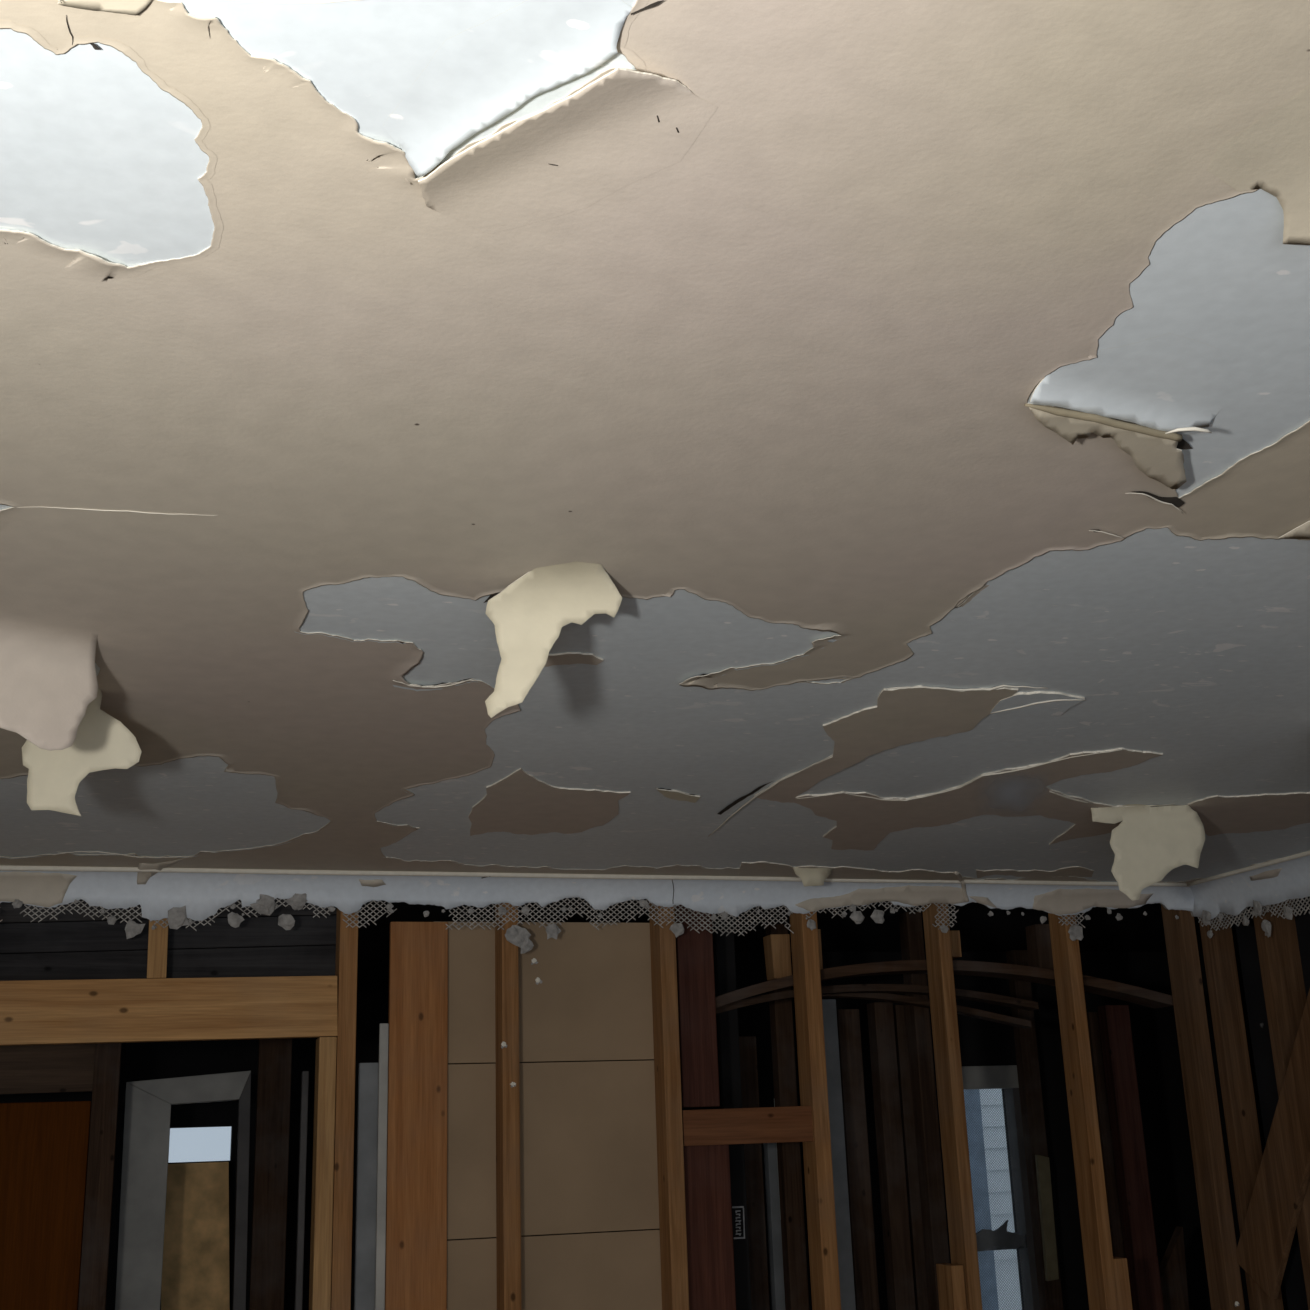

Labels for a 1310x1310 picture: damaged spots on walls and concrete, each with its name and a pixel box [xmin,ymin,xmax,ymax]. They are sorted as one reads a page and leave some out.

peeling [0,0,718,282]
peeling [1020,85,1310,500]
peeling [46,507,218,516]
peeling [0,585,397,939]
peeling [292,521,1310,954]